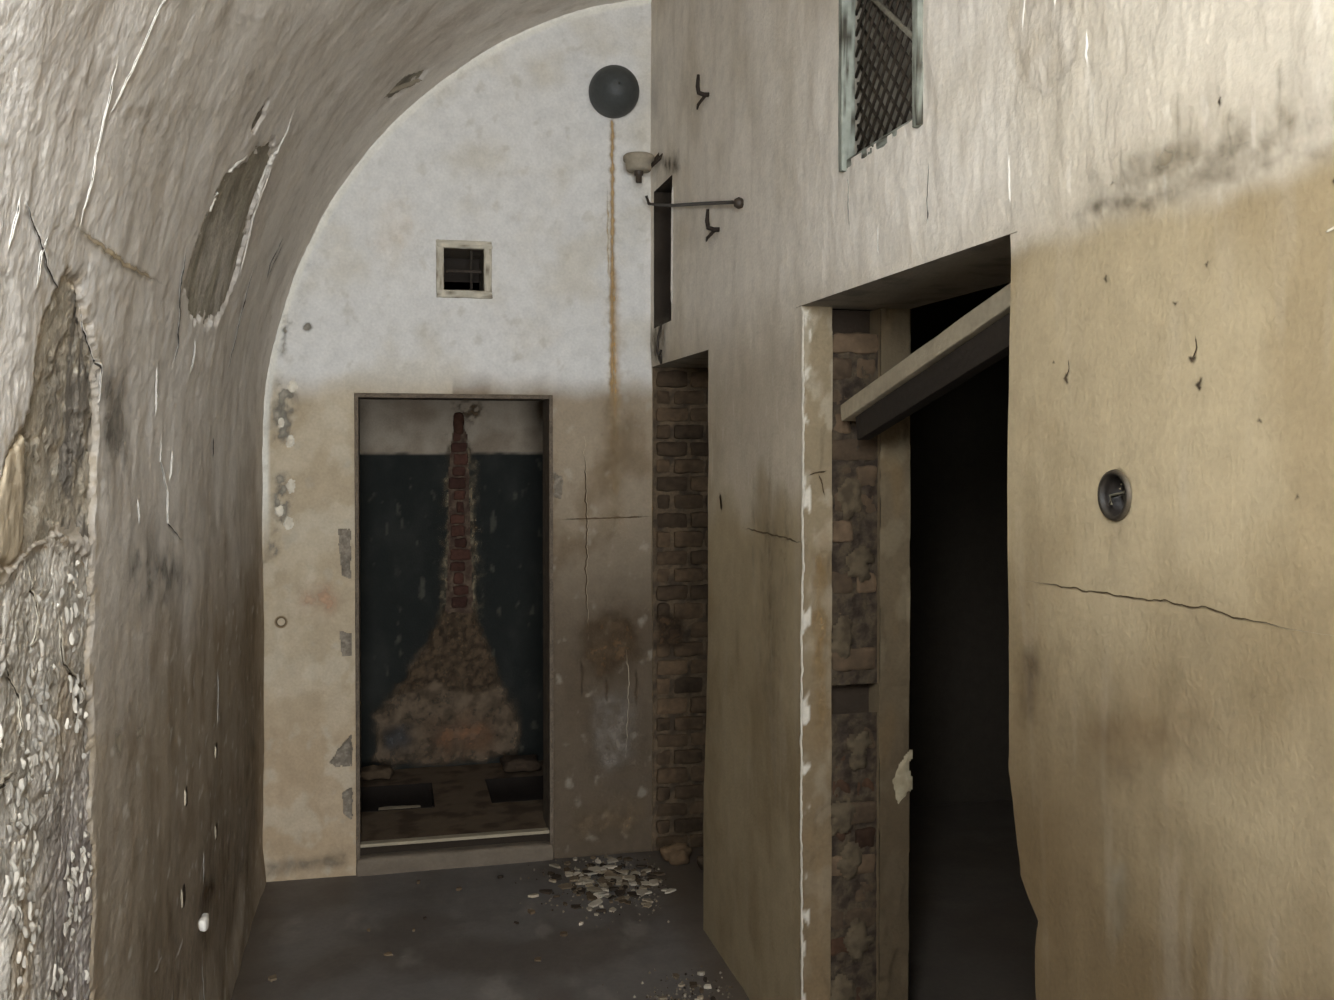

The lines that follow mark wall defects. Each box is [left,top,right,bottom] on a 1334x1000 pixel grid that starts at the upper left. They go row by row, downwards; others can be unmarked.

flaking render [183,107,297,324]
corrosion [607,121,617,400]
water stain [1156,149,1191,174]
flaking render [0,274,126,1000]
crack [1019,579,1332,636]